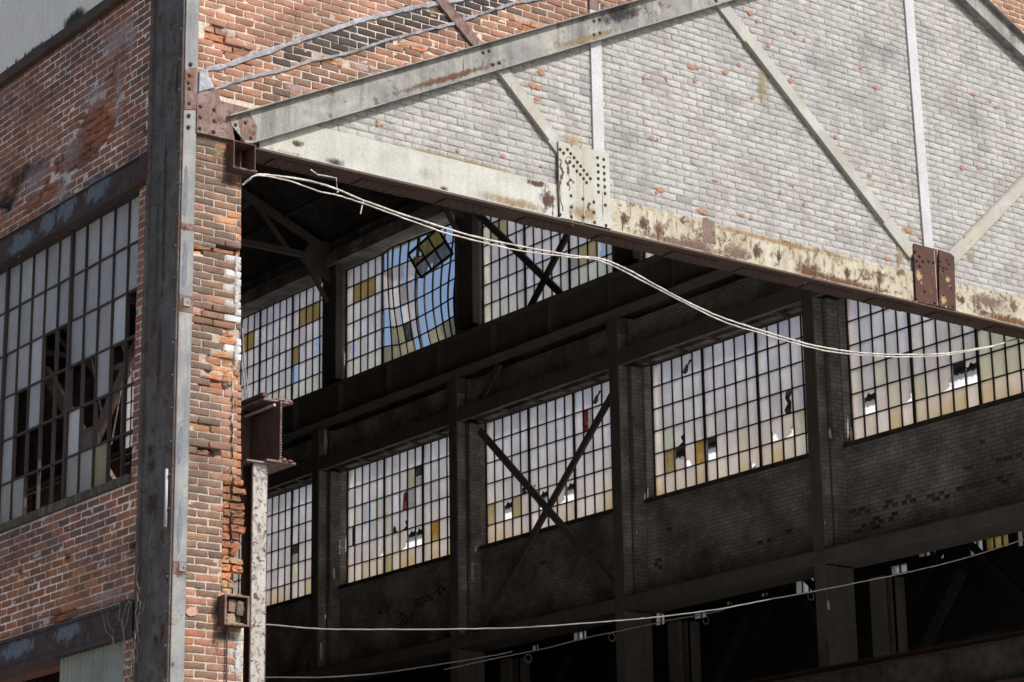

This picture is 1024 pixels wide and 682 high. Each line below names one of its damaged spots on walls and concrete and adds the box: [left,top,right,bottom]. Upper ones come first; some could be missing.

spalling [8,88,120,258]
rust [492,136,603,223]
peeling [194,244,240,315]
rust [621,206,888,292]
rust [961,294,1024,326]
spalling [200,330,240,390]
spalling [190,423,209,433]
spalling [221,478,246,594]